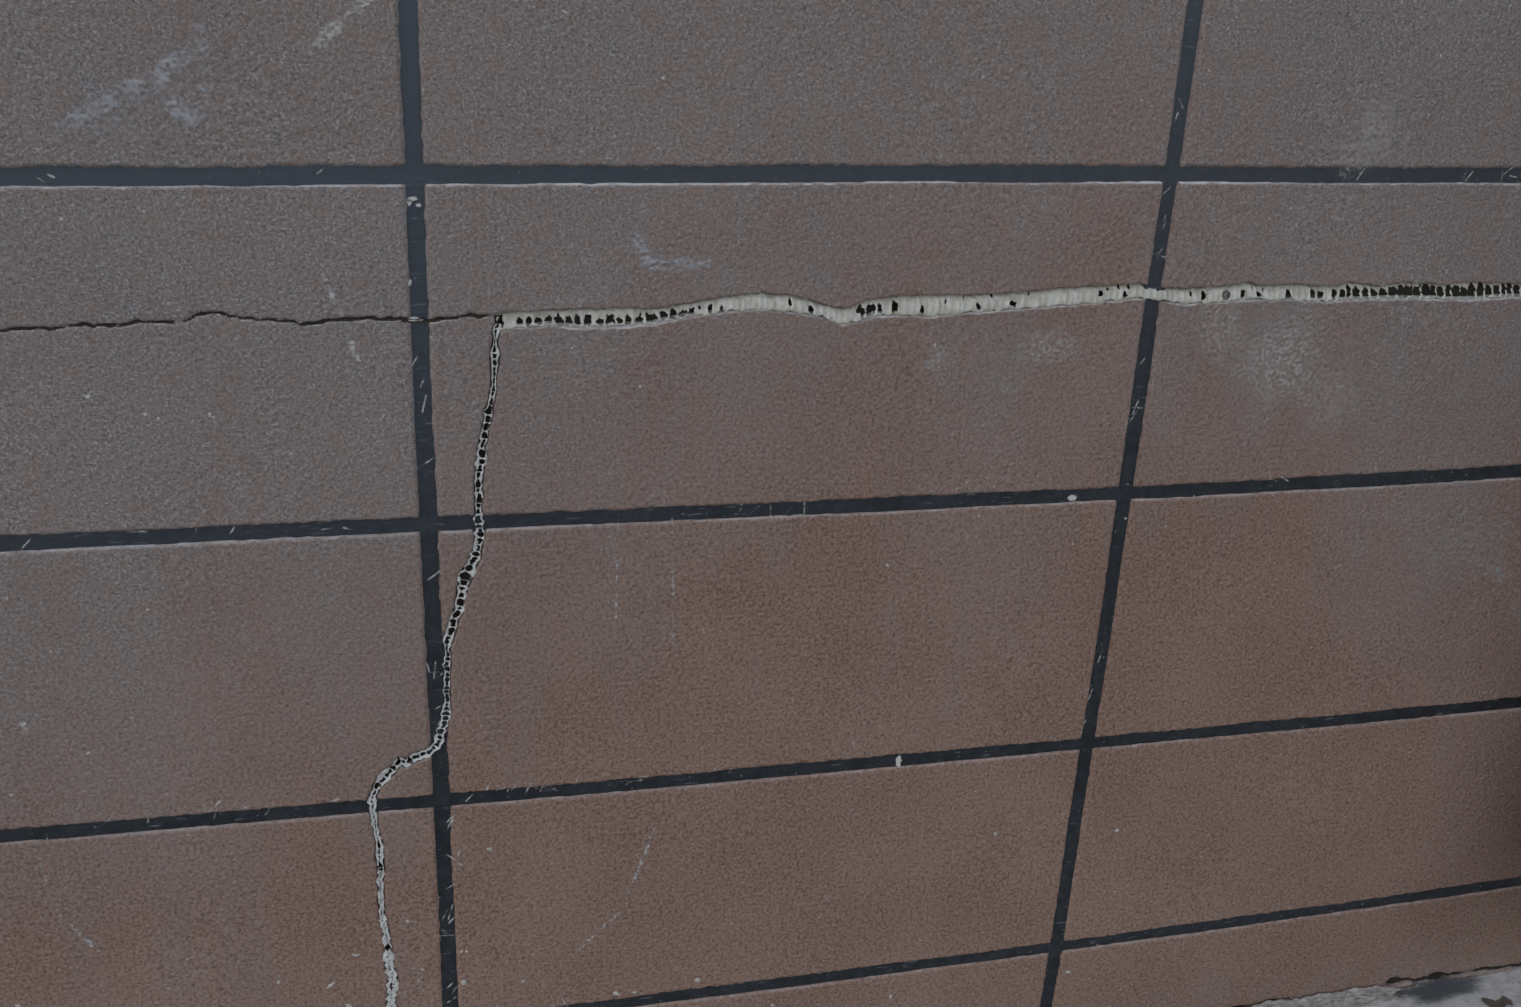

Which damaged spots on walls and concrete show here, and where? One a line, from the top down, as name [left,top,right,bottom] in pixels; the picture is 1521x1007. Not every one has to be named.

crack [0,282,1521,1007]